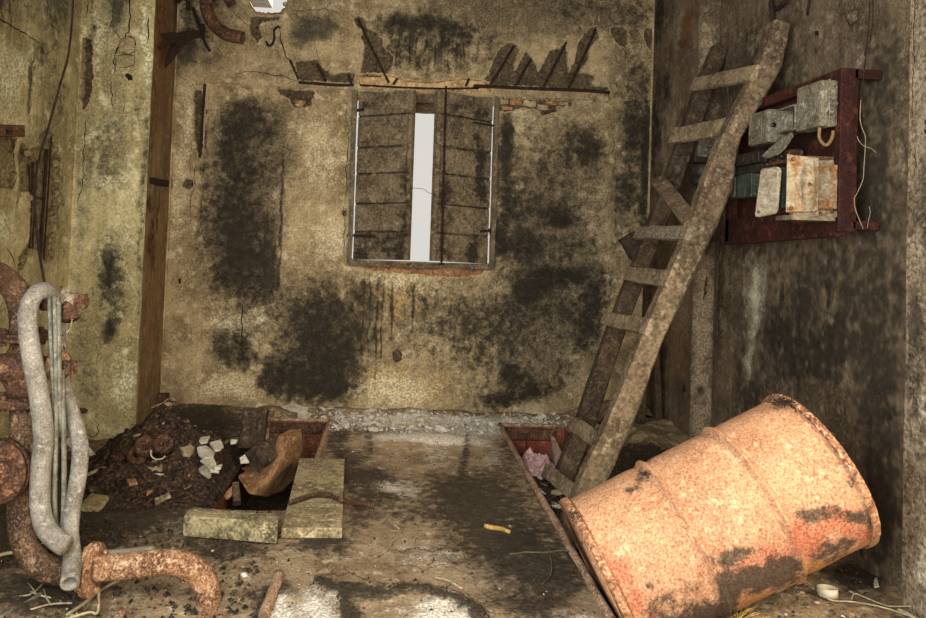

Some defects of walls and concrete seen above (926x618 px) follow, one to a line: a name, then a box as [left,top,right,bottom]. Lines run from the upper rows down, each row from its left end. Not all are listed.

spalling [79,35,95,112]
crack [110,0,197,130]
flaking render [247,0,289,44]
water stain [389,12,469,67]
flaking render [276,15,630,116]
crack [76,119,86,204]
water stain [208,105,285,301]
water stain [498,116,538,257]
water stain [566,129,601,163]
water stain [213,331,257,368]
water stain [263,280,394,398]
water stain [513,267,604,346]